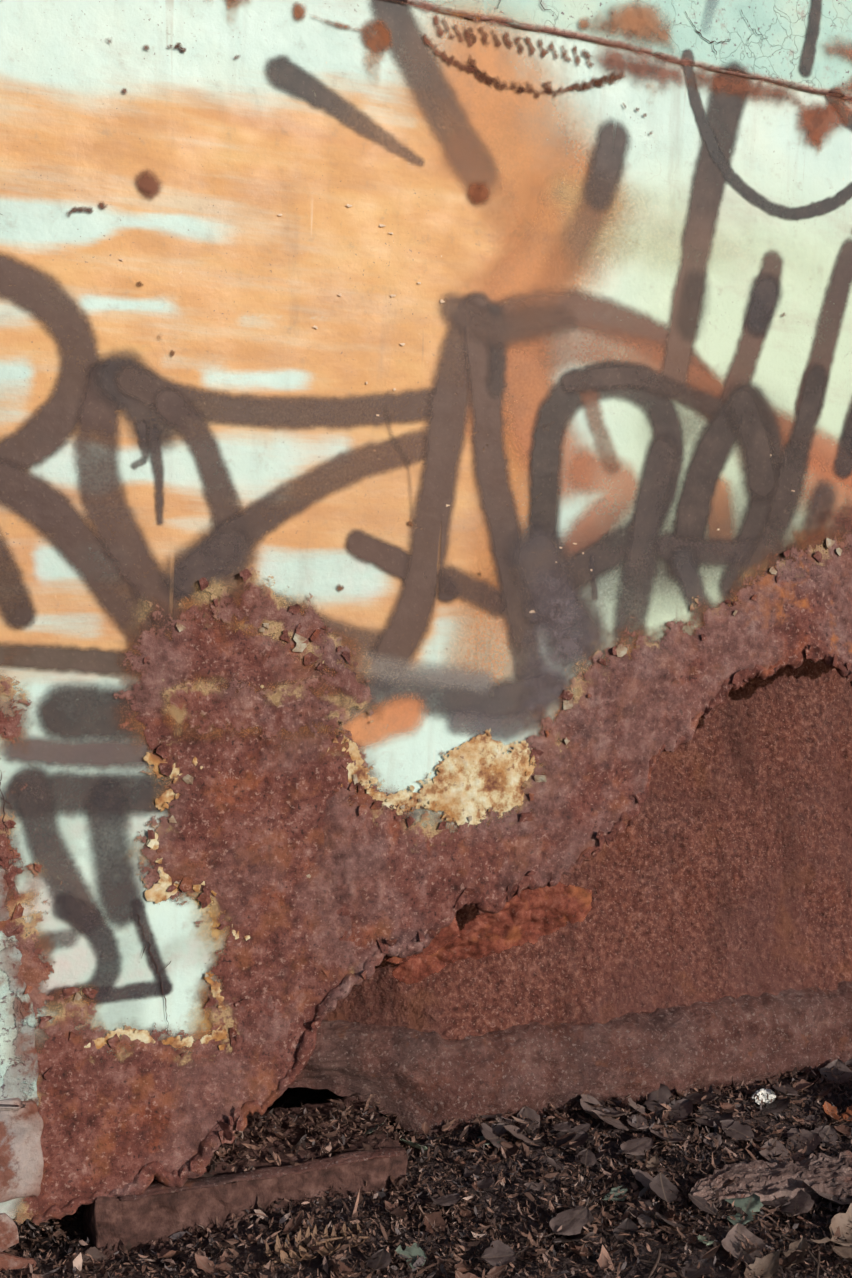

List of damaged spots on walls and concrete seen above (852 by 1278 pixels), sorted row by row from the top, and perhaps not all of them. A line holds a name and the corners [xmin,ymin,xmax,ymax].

crack [685,10,766,60]
peeling [327,729,536,826]
corrosion [0,507,852,1224]